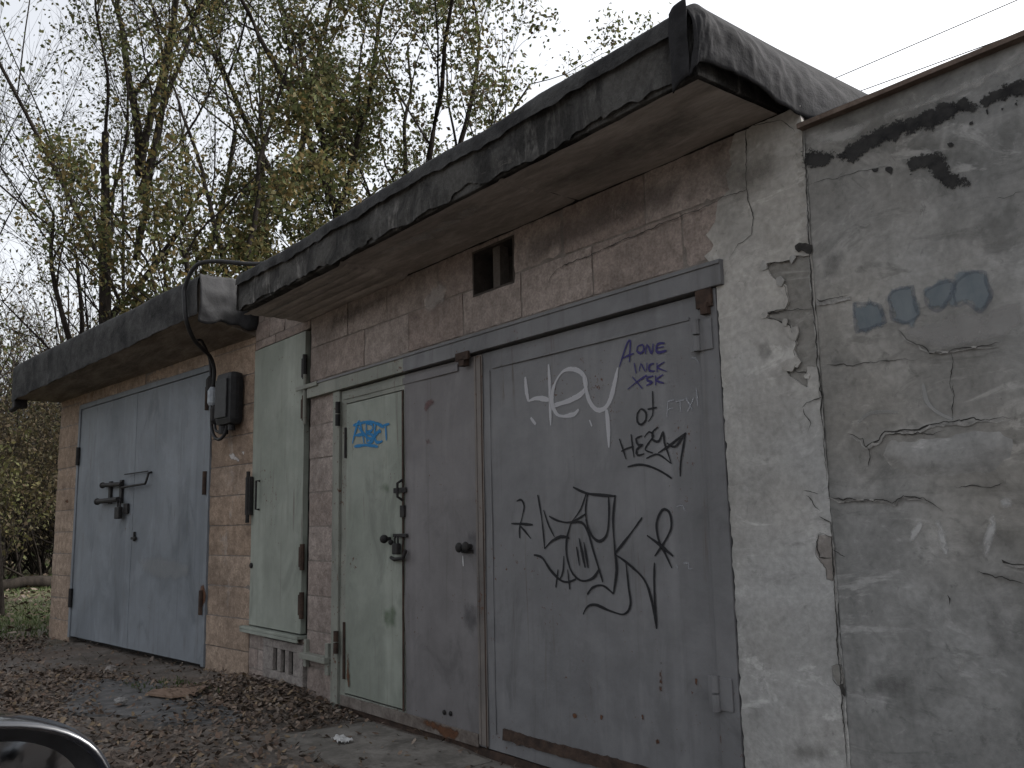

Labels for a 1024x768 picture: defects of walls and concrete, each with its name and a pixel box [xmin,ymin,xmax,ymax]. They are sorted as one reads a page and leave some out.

flaking render [760,243,851,386]
crack [544,120,1011,762]
flaking render [815,533,835,581]